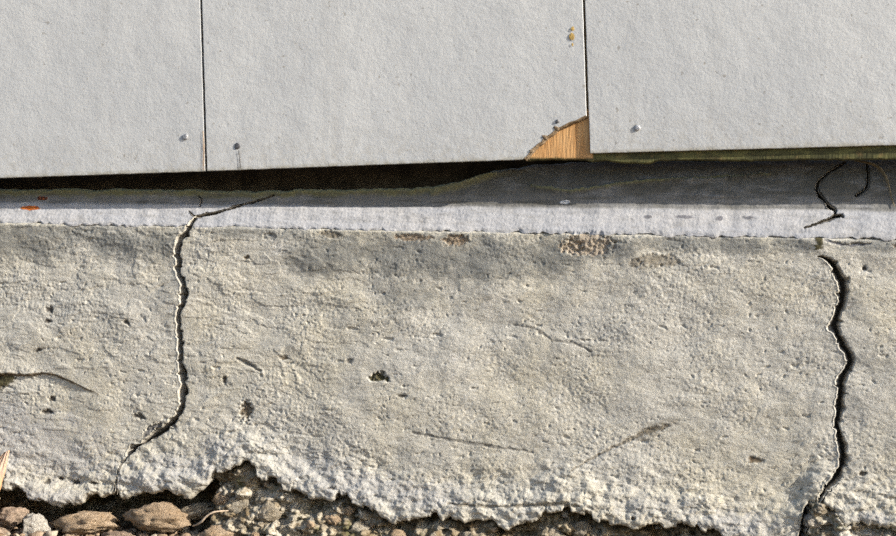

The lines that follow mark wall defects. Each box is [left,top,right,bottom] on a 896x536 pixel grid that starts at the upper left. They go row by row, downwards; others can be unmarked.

spalling [524,115,588,161]
damp [297,234,580,278]
crack [114,196,273,494]
crack [798,164,870,536]
crack [0,372,99,395]
spalling [0,461,721,536]
spalling [799,492,896,536]